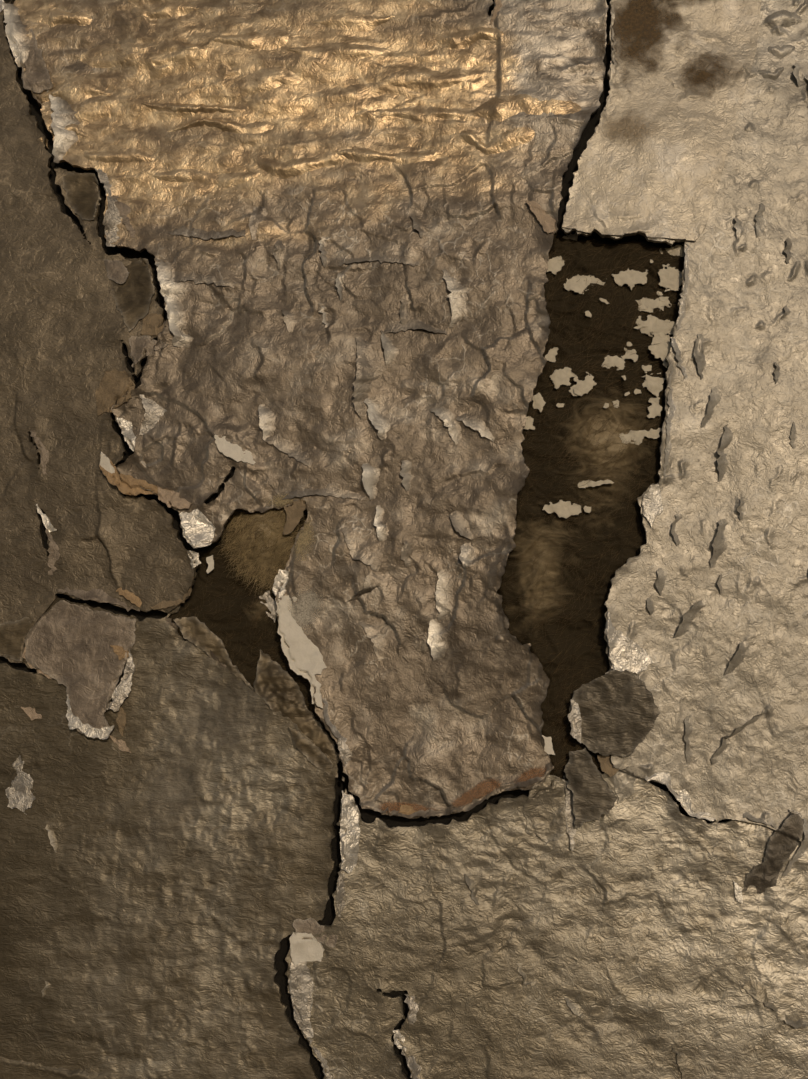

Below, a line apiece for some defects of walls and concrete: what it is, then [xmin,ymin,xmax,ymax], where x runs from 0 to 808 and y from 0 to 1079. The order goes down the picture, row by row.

crack [488,0,503,25]
damp [599,0,681,71]
damp [684,53,727,95]
crack [557,0,620,232]
crack [0,0,255,674]
peeling [641,483,663,527]
peeling [259,570,289,622]
peeling [21,600,137,753]
peeling [5,755,36,815]
crack [645,772,777,829]
spalling [733,809,808,904]
crack [274,762,551,1079]